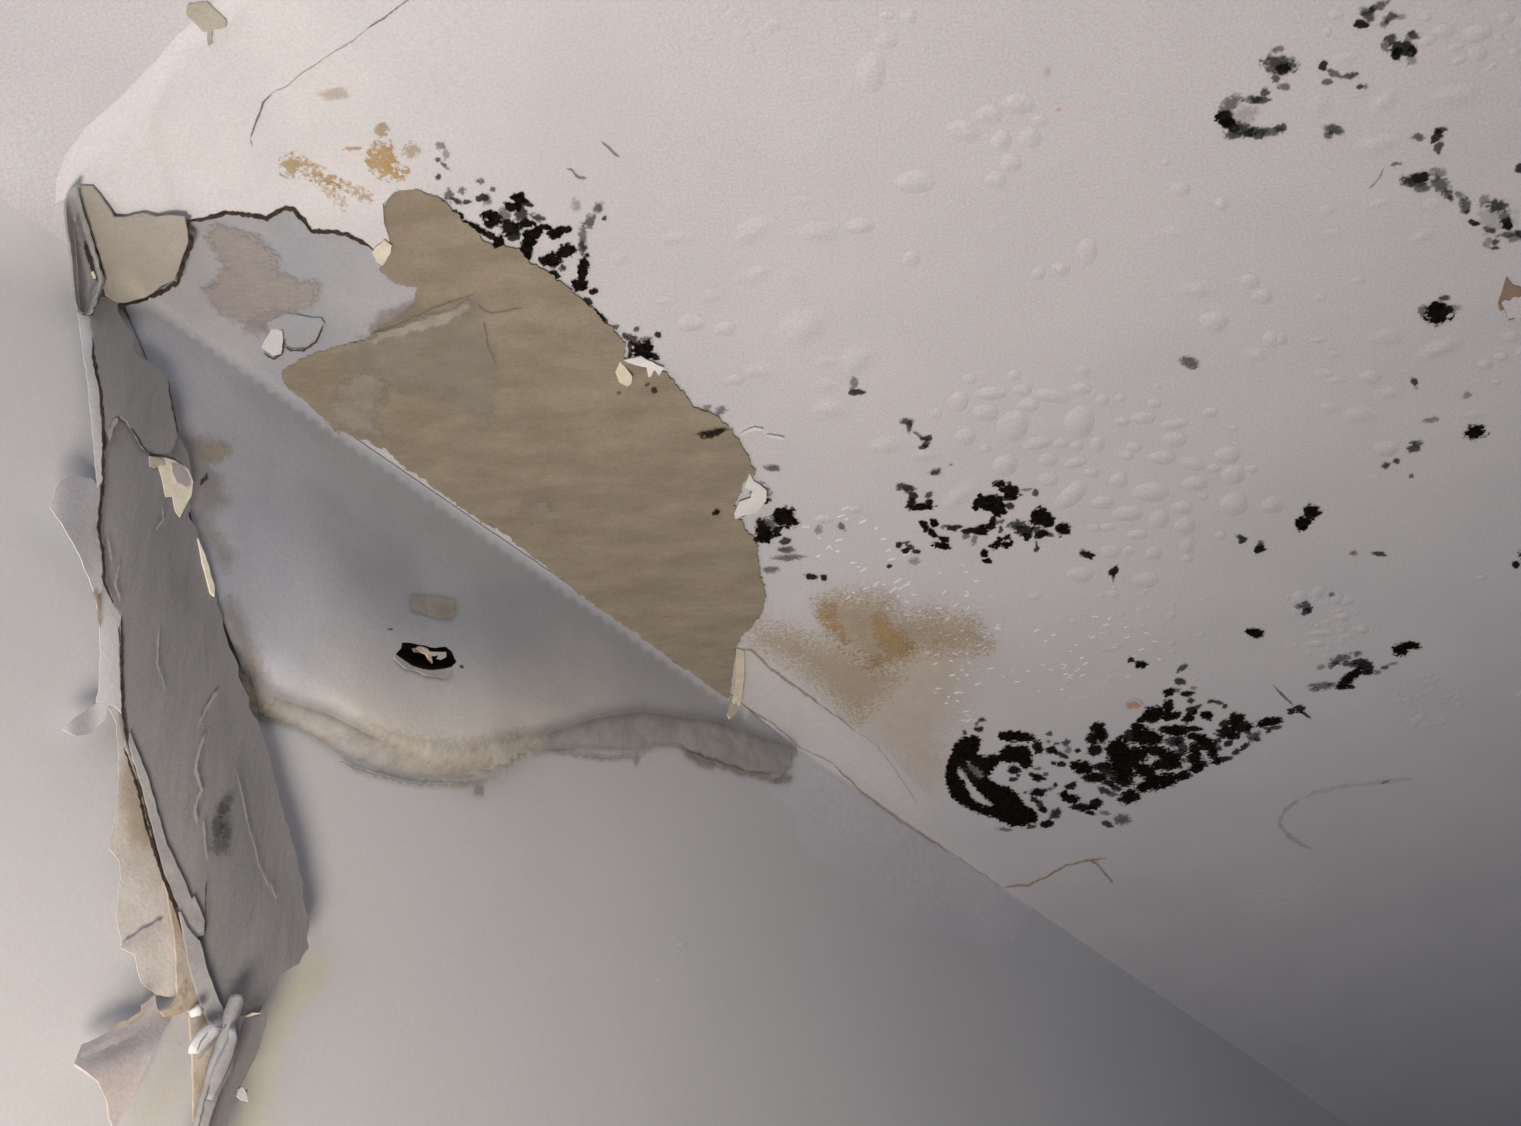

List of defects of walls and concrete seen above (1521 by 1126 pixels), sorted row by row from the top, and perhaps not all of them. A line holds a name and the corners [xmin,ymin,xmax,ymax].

crack [366,0,409,30]
leakage [1353,1,1420,61]
crack [250,94,272,138]
rust [279,152,340,190]
rust [345,123,410,181]
leakage [1214,110,1287,140]
leakage [435,158,661,360]
peeling [1498,277,1521,321]
leakage [886,480,1071,569]
flaking render [50,0,797,1126]
leakage [1327,641,1422,690]
leakage [944,664,1311,829]